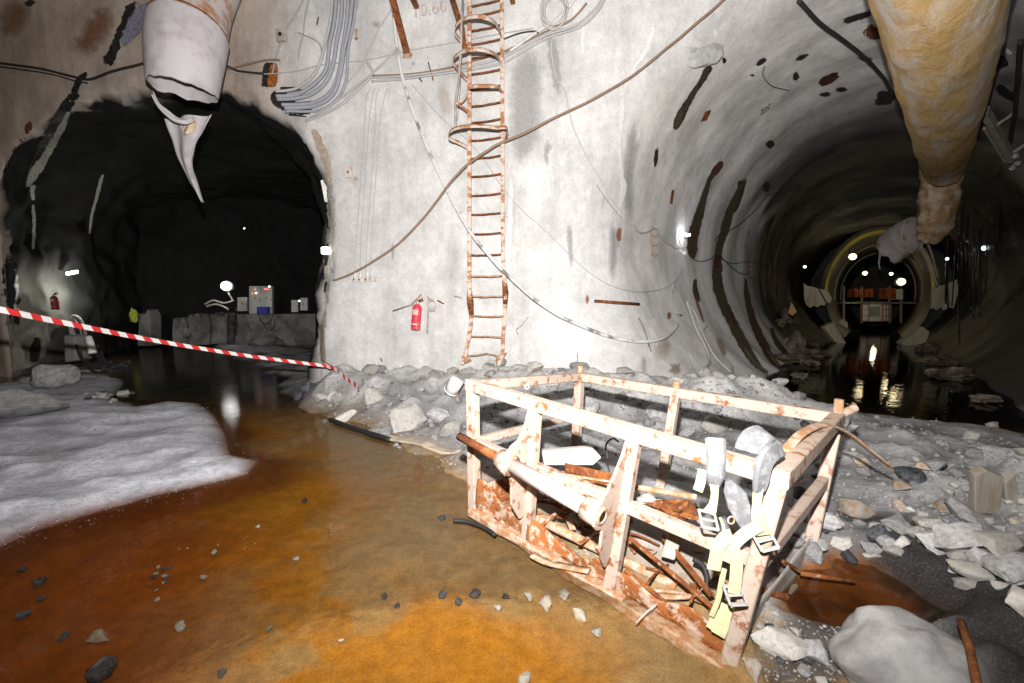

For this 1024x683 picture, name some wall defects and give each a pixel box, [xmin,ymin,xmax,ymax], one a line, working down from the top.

leakage [103,1,146,66]